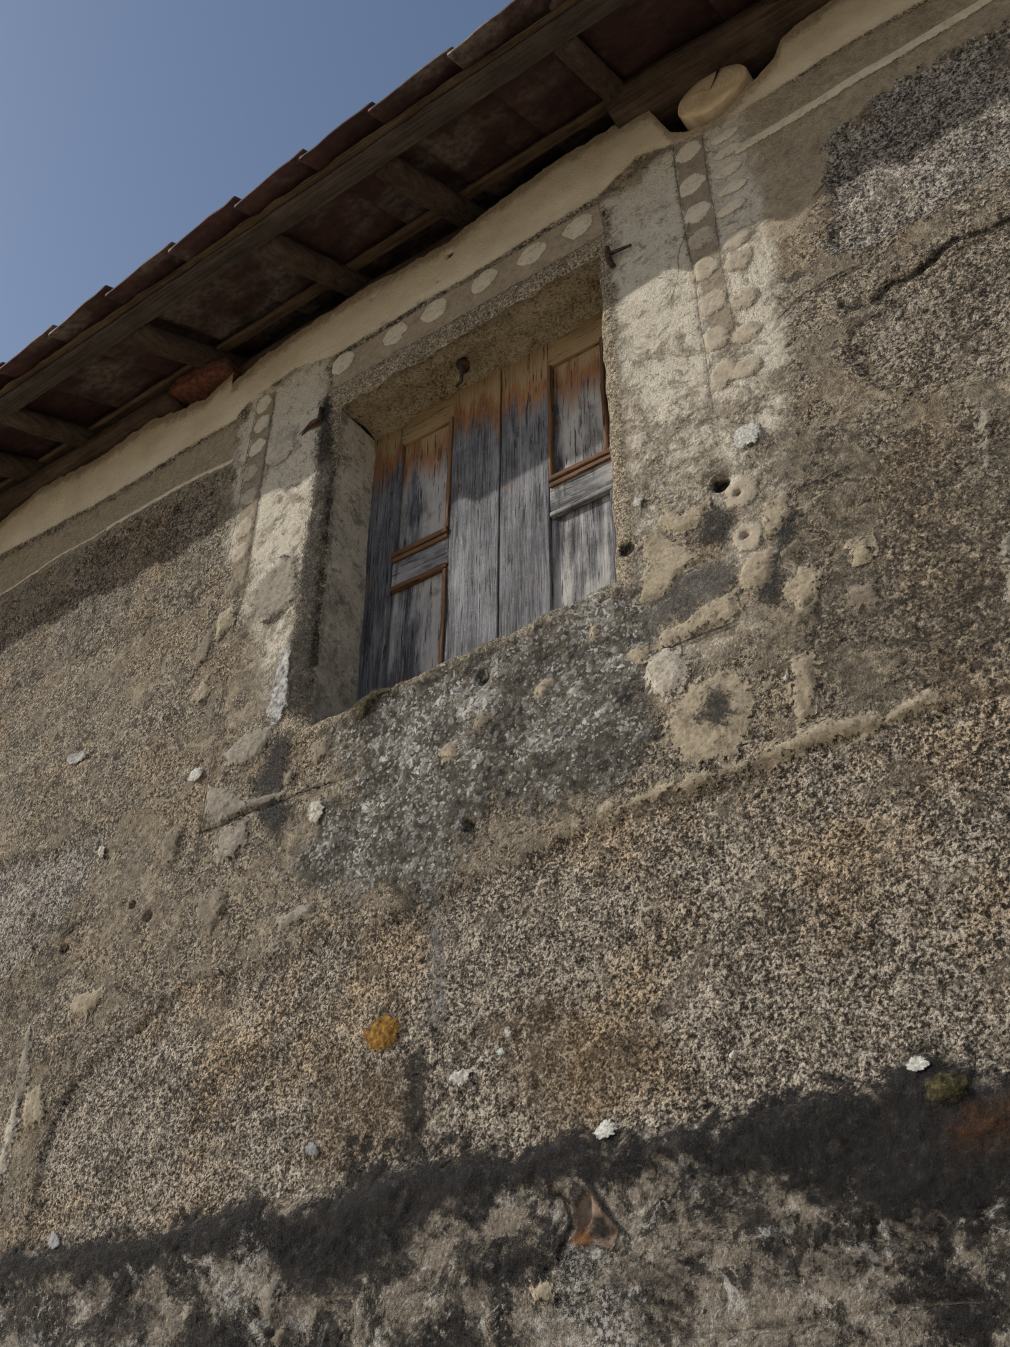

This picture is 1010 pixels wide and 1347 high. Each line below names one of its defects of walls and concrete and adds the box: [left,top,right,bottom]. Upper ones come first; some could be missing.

crack [778,217,1010,319]
peeling [972,402,1002,478]
peeling [187,551,301,705]
leakage [249,393,337,842]
peeling [625,488,891,669]
peeling [992,531,1010,603]
spalling [0,646,1010,1255]
leakage [0,1037,1010,1347]